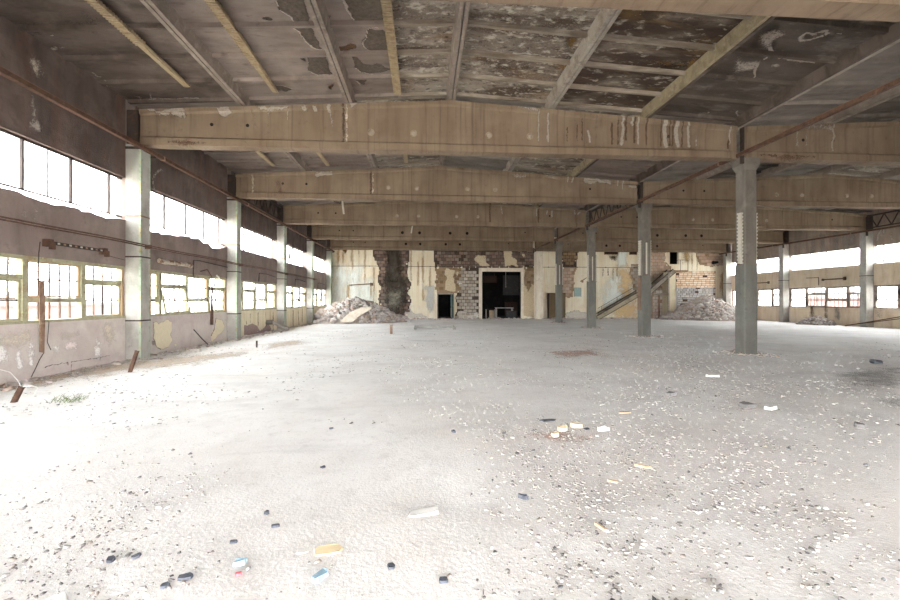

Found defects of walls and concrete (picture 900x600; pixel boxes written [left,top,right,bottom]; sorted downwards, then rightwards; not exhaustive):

peeling [339,0,390,86]
efflorescence [733,29,815,78]
efflorescence [798,30,842,42]
efflorescence [610,116,649,146]
efflorescence [660,119,698,148]
flaking render [373,250,426,319]
flaking render [434,248,536,319]
flaking render [562,252,579,298]
flaking render [696,253,723,267]
peeling [152,320,177,350]